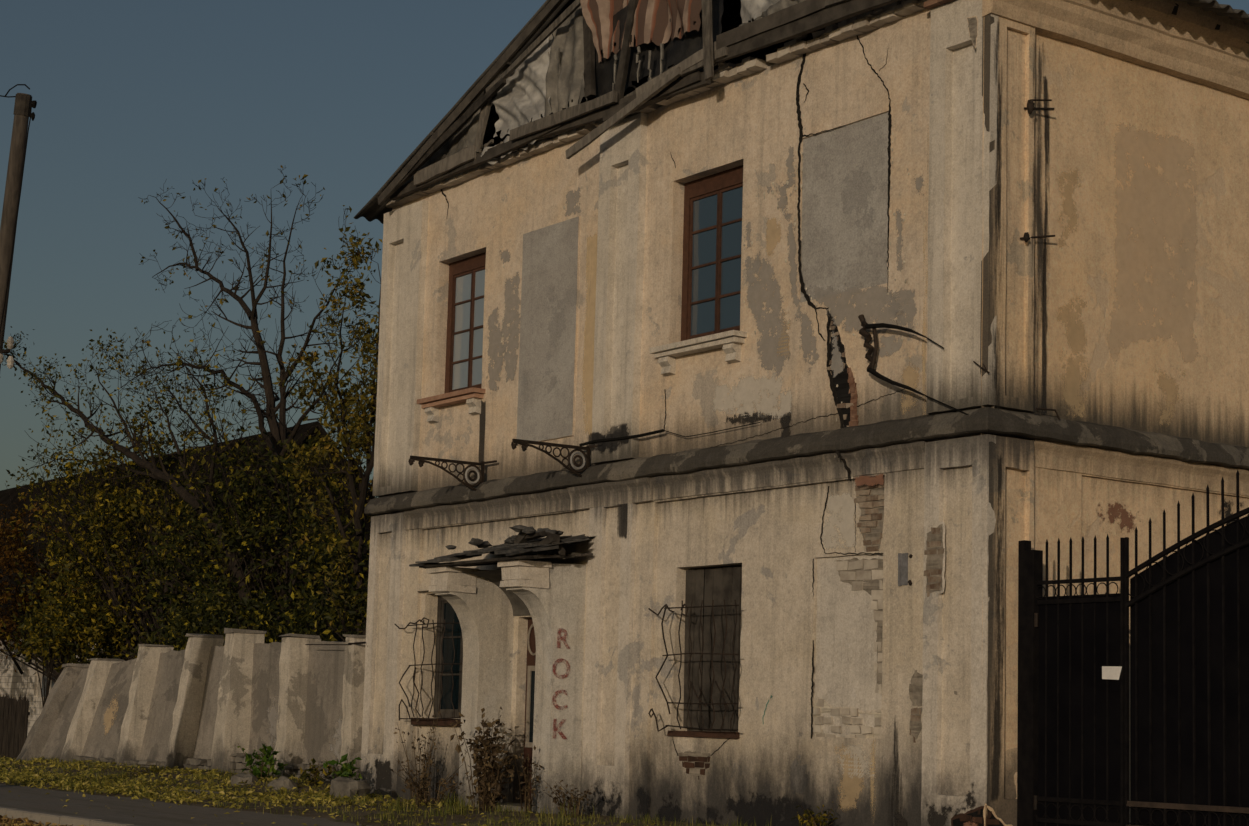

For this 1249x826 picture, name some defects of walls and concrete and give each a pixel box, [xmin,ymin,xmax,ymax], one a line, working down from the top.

peeling [486,247,521,394]
crack [715,35,904,595]
peeling [713,146,918,427]
spalling [822,476,885,694]
spalling [923,522,945,597]
crack [808,640,816,739]
spalling [812,698,882,739]
spalling [908,670,923,743]
water stain [589,783,621,817]
water stain [636,787,835,826]
water stain [891,723,907,826]